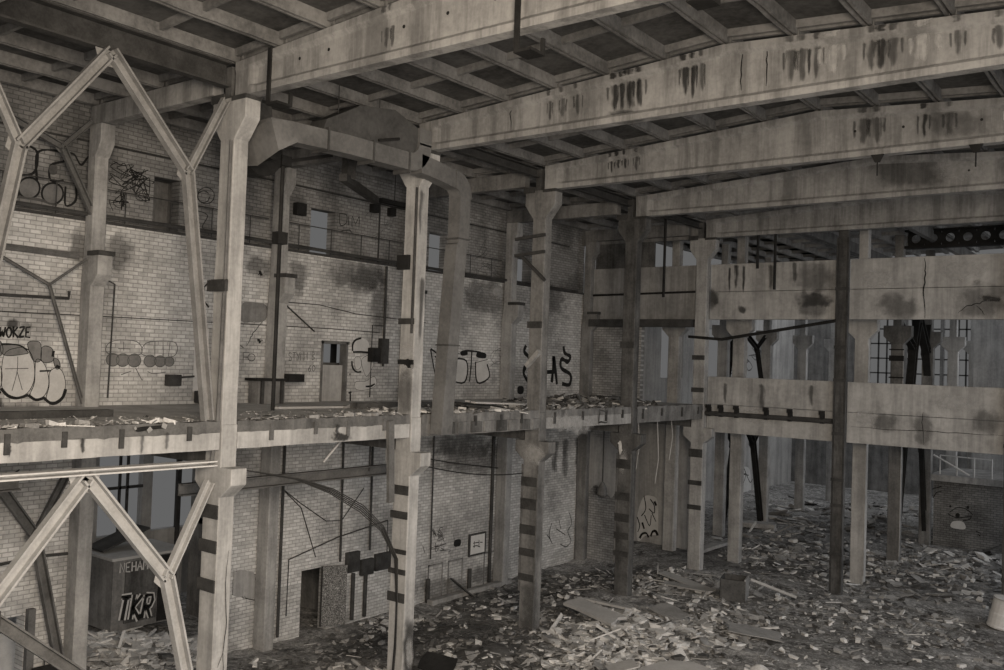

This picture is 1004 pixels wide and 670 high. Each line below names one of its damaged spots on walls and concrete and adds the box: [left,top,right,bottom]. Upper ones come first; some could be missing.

water stain [607,67,647,121]
water stain [679,50,705,97]
water stain [783,30,846,78]
water stain [863,19,966,68]
water stain [992,10,1002,47]
water stain [853,107,885,141]
water stain [917,103,930,136]
crack [920,258,928,308]